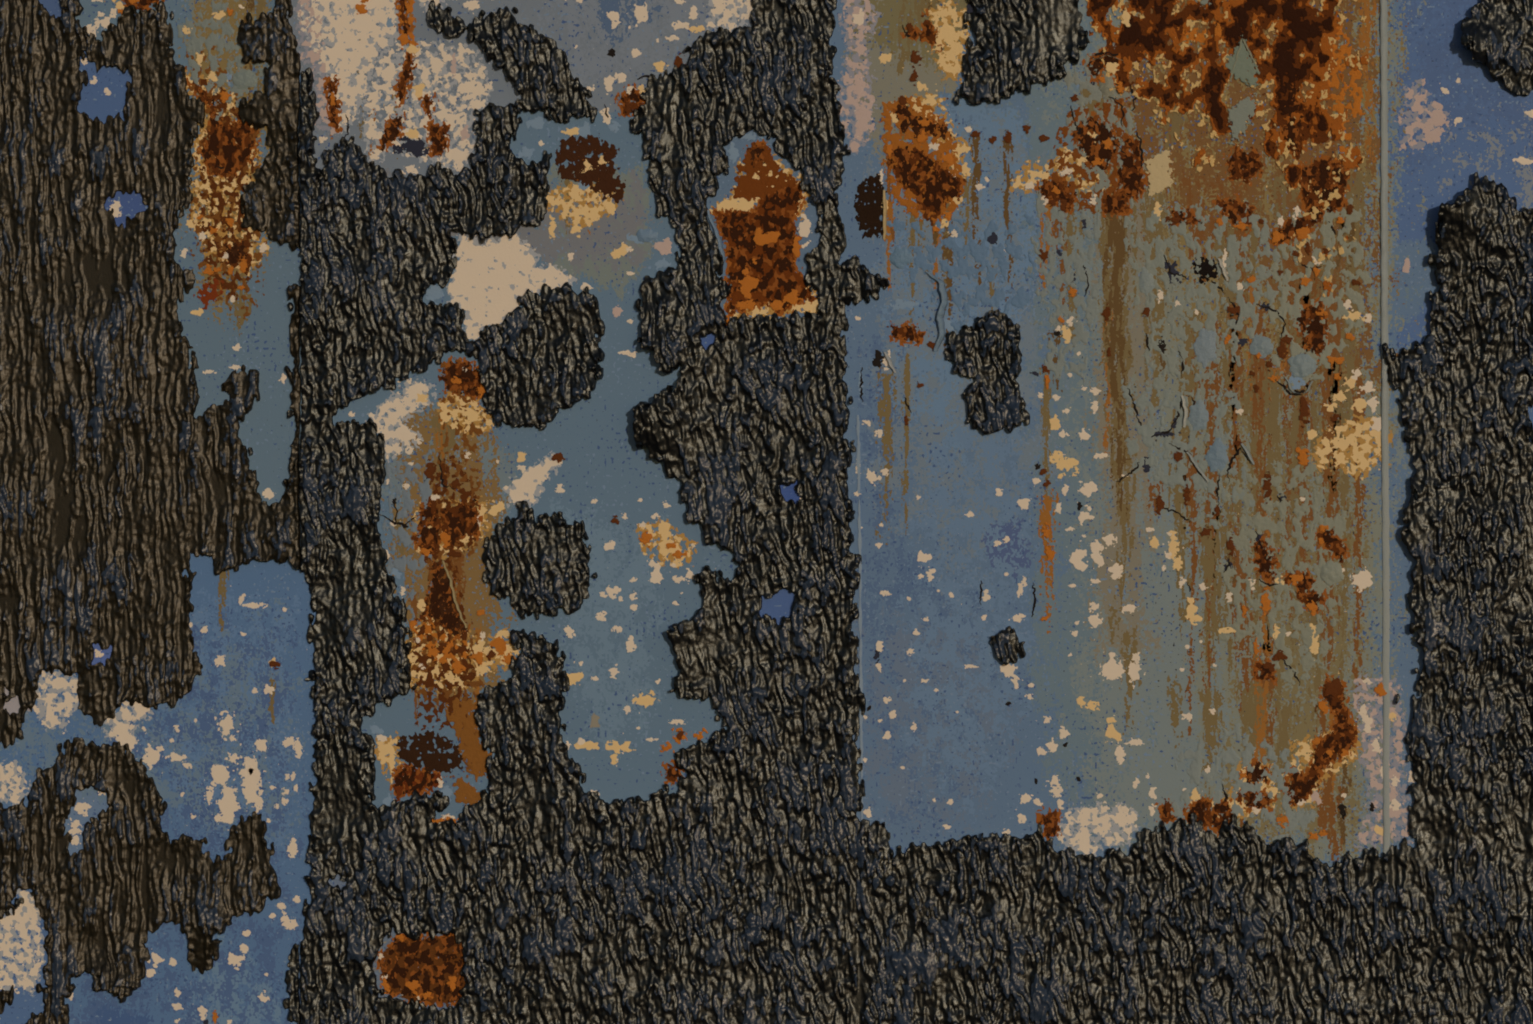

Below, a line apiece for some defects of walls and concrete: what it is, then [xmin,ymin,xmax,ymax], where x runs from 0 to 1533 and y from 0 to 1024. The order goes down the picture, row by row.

rust [118,0,165,14]
rust [185,46,268,337]
rust [555,133,626,239]
rust [710,139,818,325]
peeling [1512,156,1533,165]
peeling [39,0,755,824]
peeling [701,0,1463,868]
rust [854,0,1387,861]
rust [390,355,517,823]
peeling [0,553,317,1024]
peeling [328,873,348,895]
rust [376,931,466,1008]